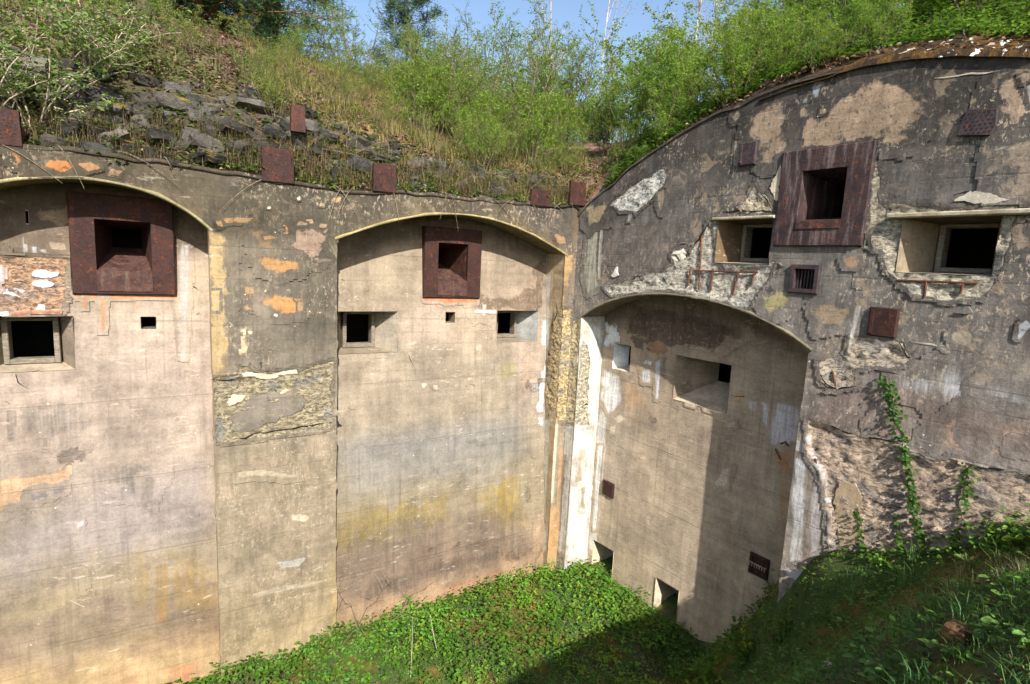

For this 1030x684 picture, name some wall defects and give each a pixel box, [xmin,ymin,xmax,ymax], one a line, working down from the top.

spalling [0,187,91,317]
spalling [201,190,347,447]
peeling [464,229,590,432]
spalling [579,164,670,238]
peeling [602,53,1030,395]
peeling [0,440,164,523]
spalling [801,392,1030,555]